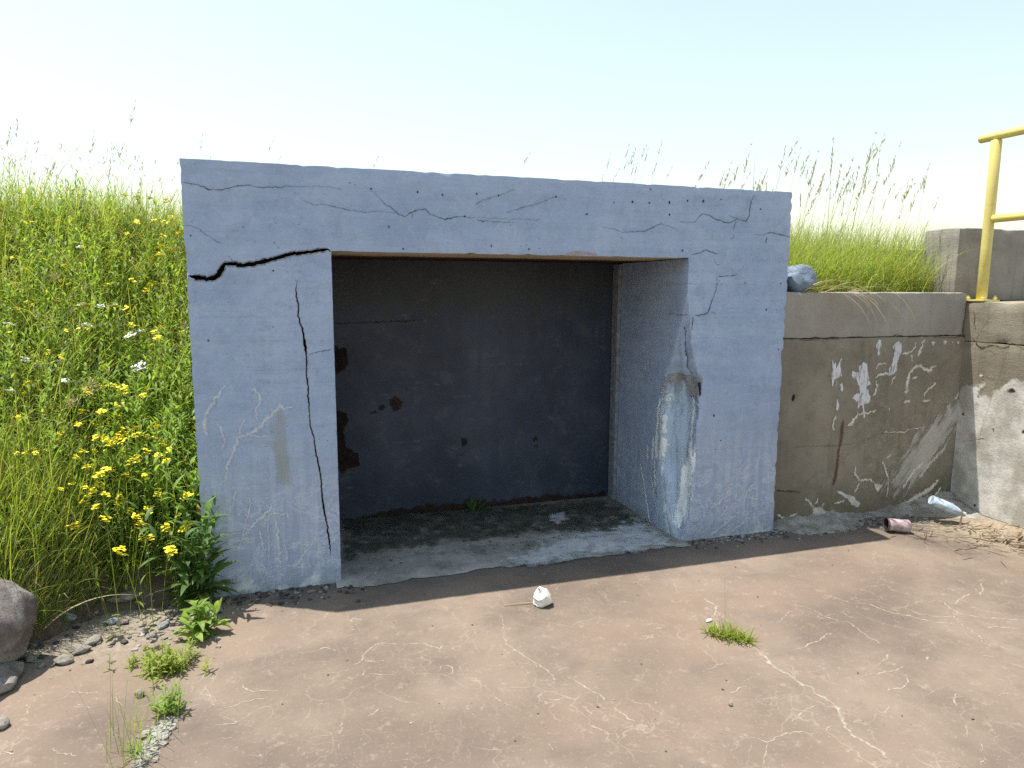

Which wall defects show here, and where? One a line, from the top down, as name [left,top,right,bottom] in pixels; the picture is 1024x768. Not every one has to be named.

crack [184,182,556,223]
crack [185,225,331,554]
spalling [662,373,703,400]
corrosion [833,421,844,485]